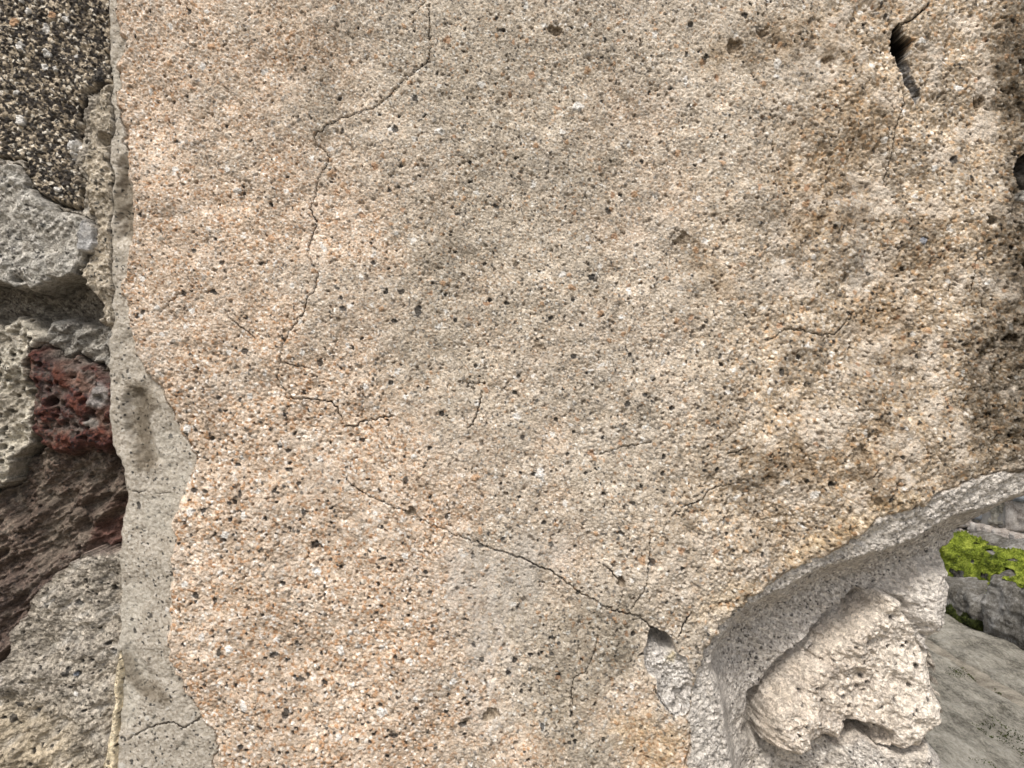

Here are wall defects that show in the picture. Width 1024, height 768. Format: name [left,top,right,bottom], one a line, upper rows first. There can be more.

peeling [76,0,219,768]
crack [276,2,432,427]
crack [347,480,652,628]
spalling [644,469,1024,768]